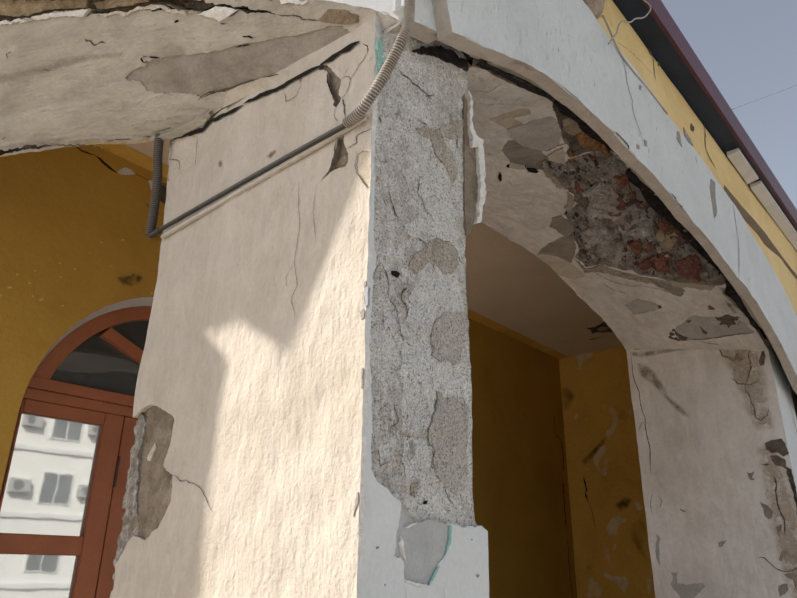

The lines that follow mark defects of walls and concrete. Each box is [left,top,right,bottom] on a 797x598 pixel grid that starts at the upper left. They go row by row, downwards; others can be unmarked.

crack [0,41,359,180]
crack [289,184,317,317]
spalling [488,96,727,315]
spalling [360,37,487,590]
flaking render [585,322,614,340]
flaking render [668,305,769,421]
spalling [112,404,157,589]
flaking render [760,476,786,537]
flaking render [763,439,789,470]
peeling [671,572,705,598]
flaking render [759,549,797,596]